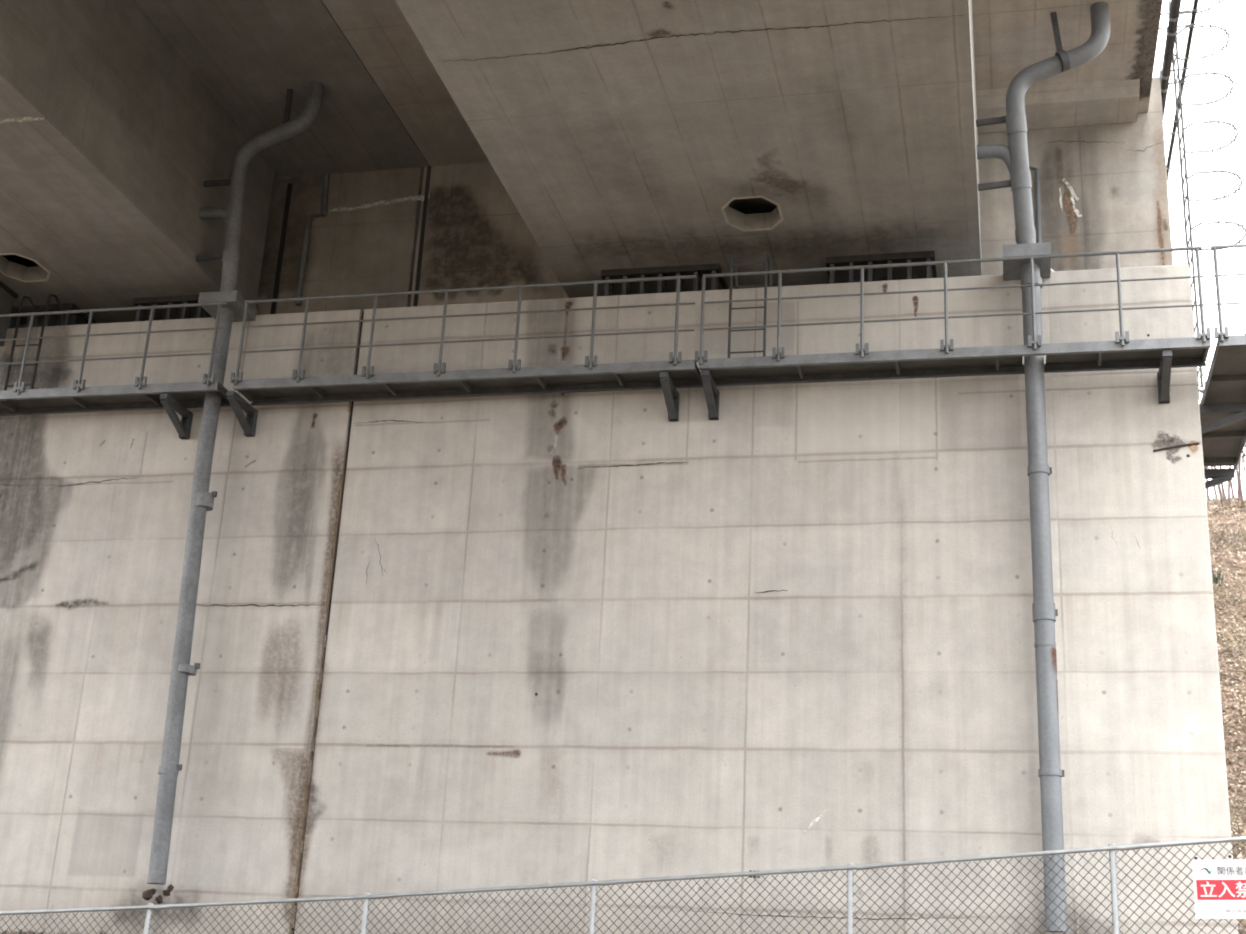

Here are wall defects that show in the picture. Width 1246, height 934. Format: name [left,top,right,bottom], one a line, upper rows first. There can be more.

crack [447,15,964,61]
spalling [1153,434,1200,461]
rust [552,459,566,483]